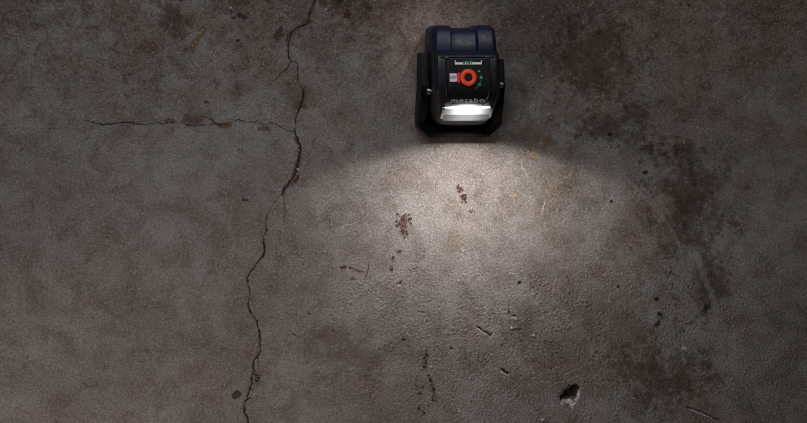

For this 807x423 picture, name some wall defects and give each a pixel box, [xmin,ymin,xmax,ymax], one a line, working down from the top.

crack [88,0,316,423]